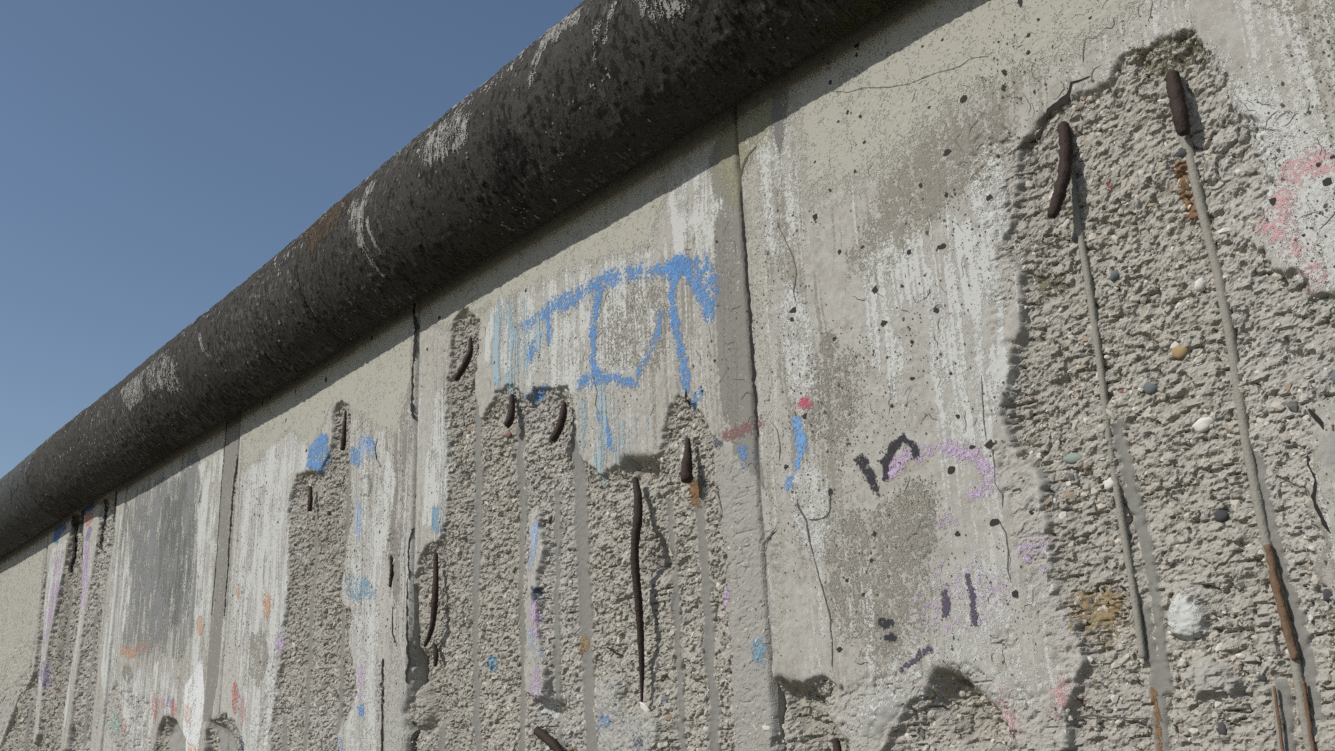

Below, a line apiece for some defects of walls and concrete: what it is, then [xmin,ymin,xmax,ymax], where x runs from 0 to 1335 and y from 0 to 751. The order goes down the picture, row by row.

crack [832,0,1153,177]
crack [1225,99,1326,171]
crack [847,138,963,347]
spalling [406,22,1335,751]
crack [870,377,1039,609]
spalling [374,661,385,723]